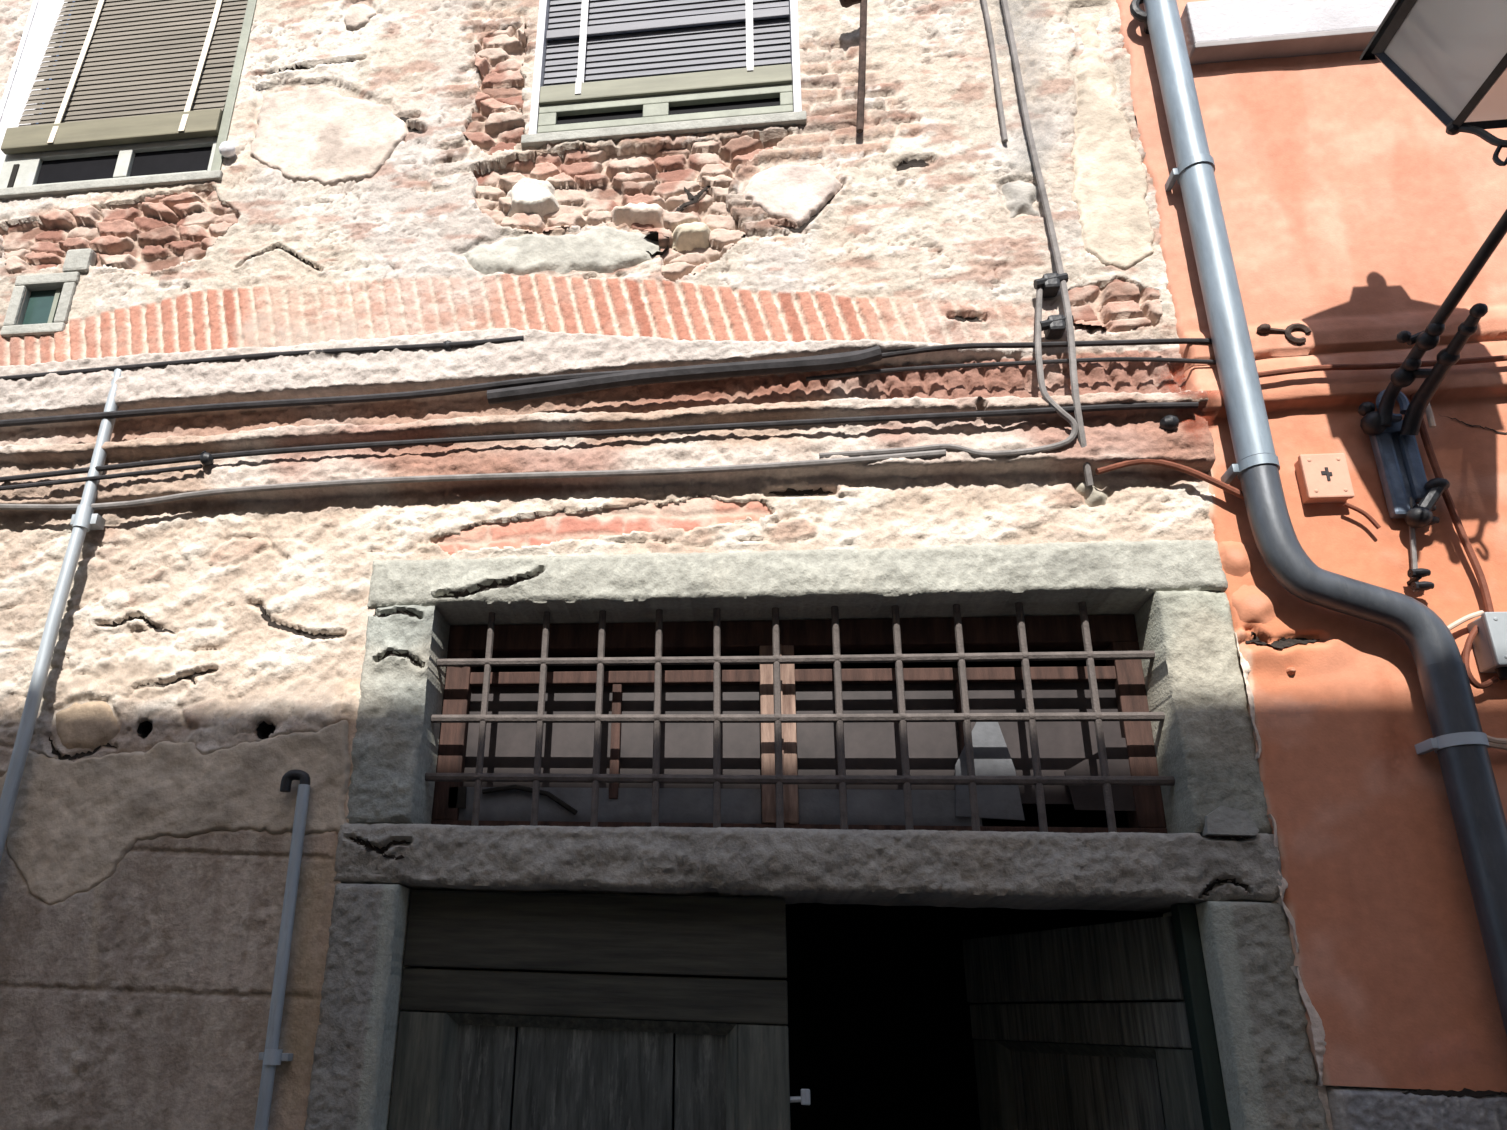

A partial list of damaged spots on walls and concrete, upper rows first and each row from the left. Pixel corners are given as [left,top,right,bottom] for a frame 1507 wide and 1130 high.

flaking render [462,23,842,283]
flaking render [0,190,240,275]
crack [101,616,175,633]
crack [251,604,344,639]
crack [374,572,542,668]
crack [1246,632,1320,649]
crack [137,669,217,688]
peeling [1234,632,1262,759]
crack [349,836,411,860]
crack [1205,834,1249,842]
crack [1202,878,1249,895]
spalling [1201,806,1327,1086]